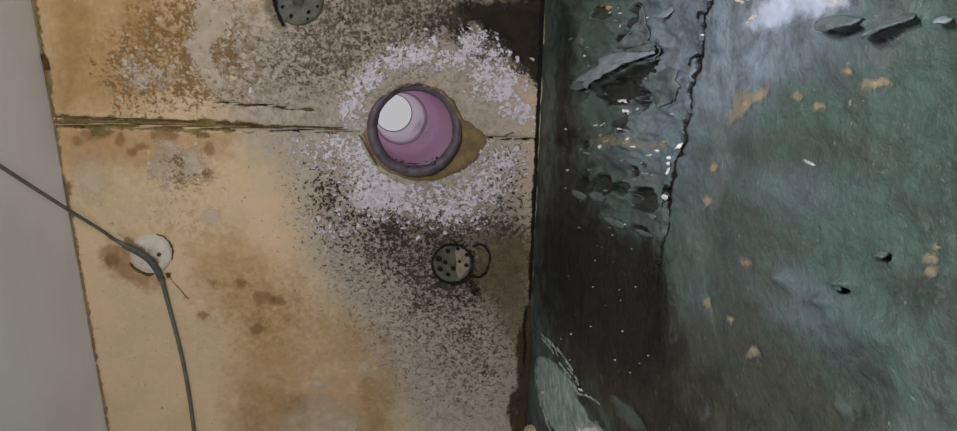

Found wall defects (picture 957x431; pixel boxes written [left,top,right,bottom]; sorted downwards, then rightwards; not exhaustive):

crack [31,0,377,431]
leakage [255,0,603,431]
peeling [565,3,681,237]
crack [656,0,714,275]
leakage [613,396,646,430]